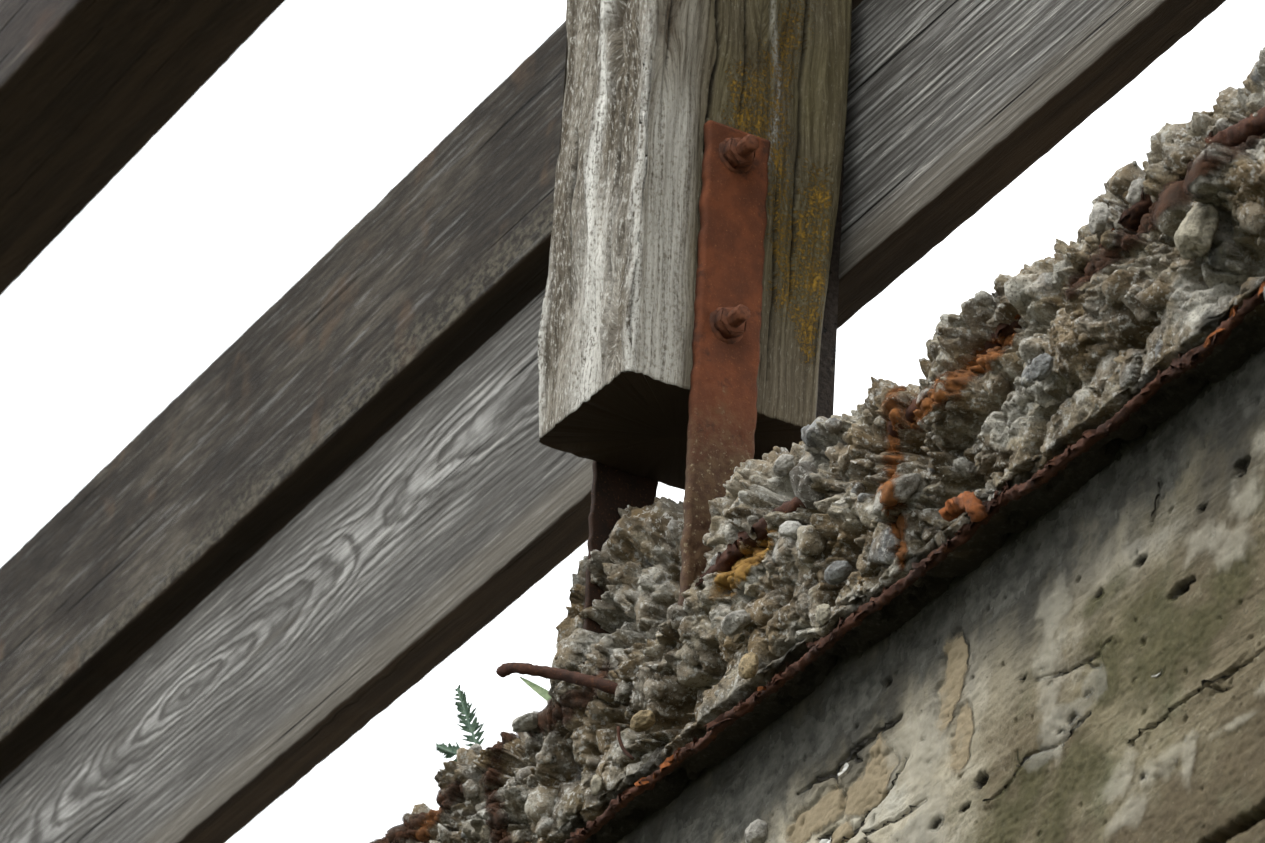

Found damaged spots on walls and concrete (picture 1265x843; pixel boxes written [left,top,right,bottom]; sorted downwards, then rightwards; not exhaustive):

spalling [386,47,1265,843]
rust [877,333,1015,570]
rust [709,528,774,601]
rust [480,661,610,843]
crack [982,712,1091,801]
crack [1126,651,1264,744]